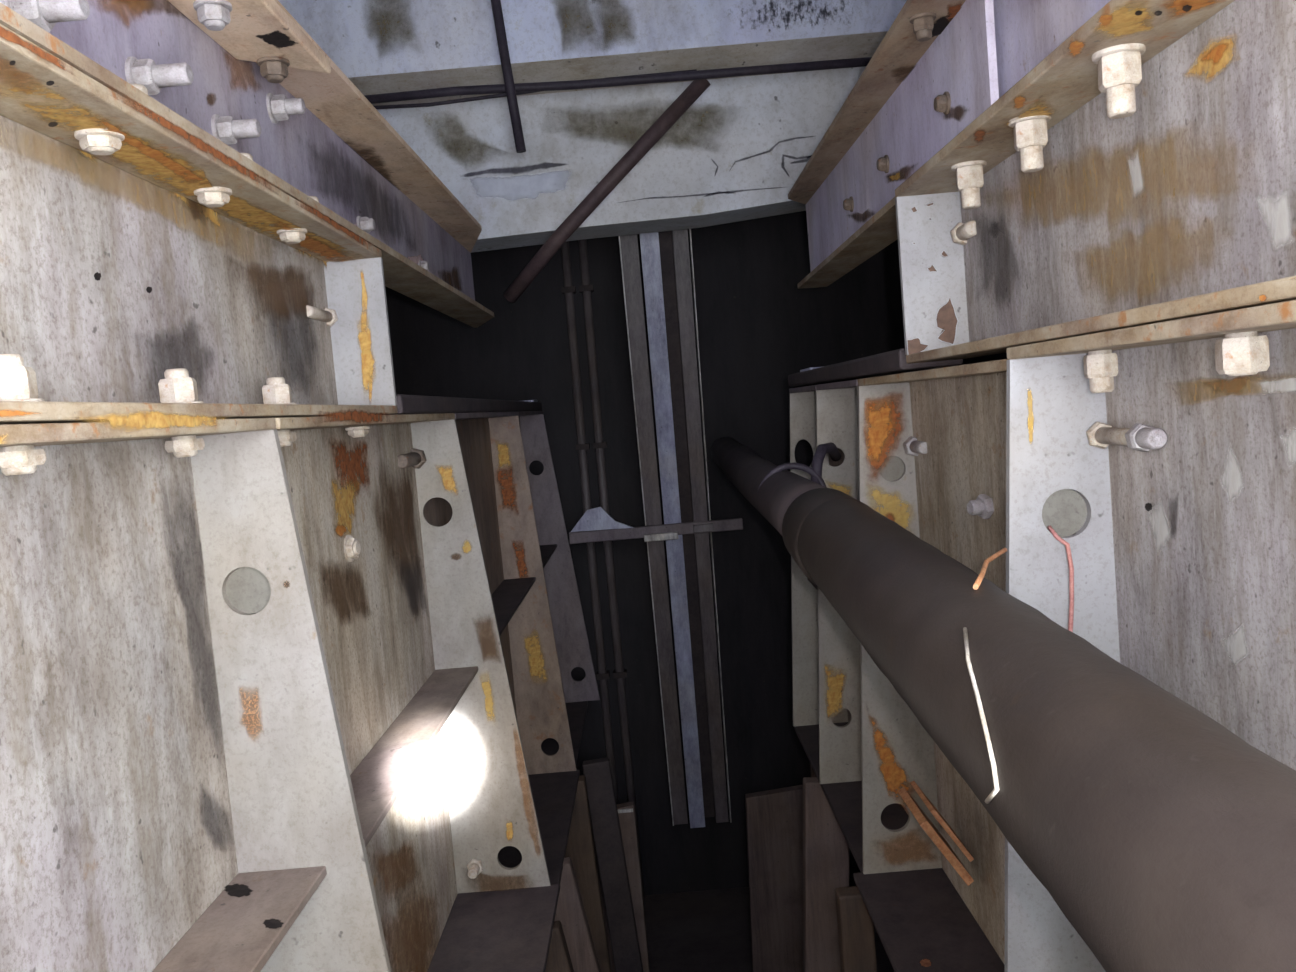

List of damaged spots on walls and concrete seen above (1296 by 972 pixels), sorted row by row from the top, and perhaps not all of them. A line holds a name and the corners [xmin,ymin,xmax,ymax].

water stain [371,0,412,50]
water stain [558,0,630,43]
water stain [741,0,845,28]
rust [0,26,370,267]
water stain [442,118,567,200]
water stain [569,107,721,146]
crack [619,136,814,203]
rust [1007,136,1218,224]
rust [325,272,387,423]
rust [96,411,216,430]
rust [332,441,370,536]
rust [865,395,910,529]